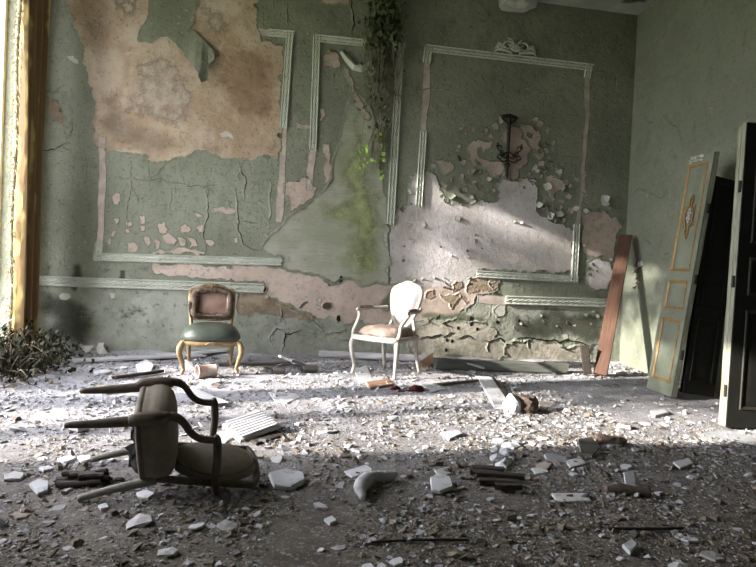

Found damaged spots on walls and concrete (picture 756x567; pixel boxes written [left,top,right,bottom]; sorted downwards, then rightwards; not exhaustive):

spalling [64,0,285,164]
crack [113,160,274,256]
spalling [107,49,623,361]
crack [268,301,355,352]
crack [420,332,599,352]